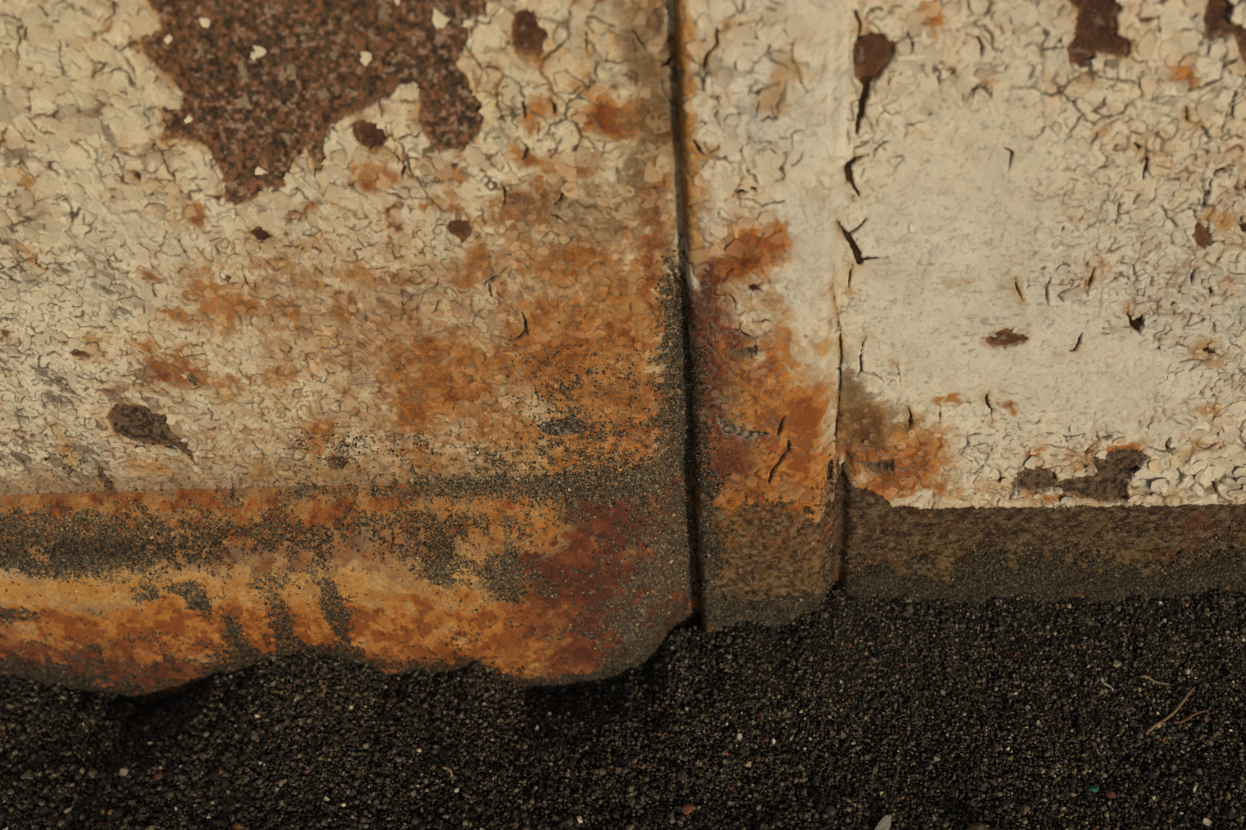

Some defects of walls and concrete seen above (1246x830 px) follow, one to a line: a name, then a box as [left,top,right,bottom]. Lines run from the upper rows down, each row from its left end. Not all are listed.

peeling [0,0,547,498]
rust [379,200,671,482]
rust [576,83,654,142]
crack [762,417,791,482]
crack [843,76,880,294]
crack [827,333,899,480]
rust [674,0,1246,635]
peeling [986,326,1025,350]
peeling [845,0,1246,122]
peeling [1000,402,1246,506]
crack [1133,142,1148,179]
rust [0,473,699,699]